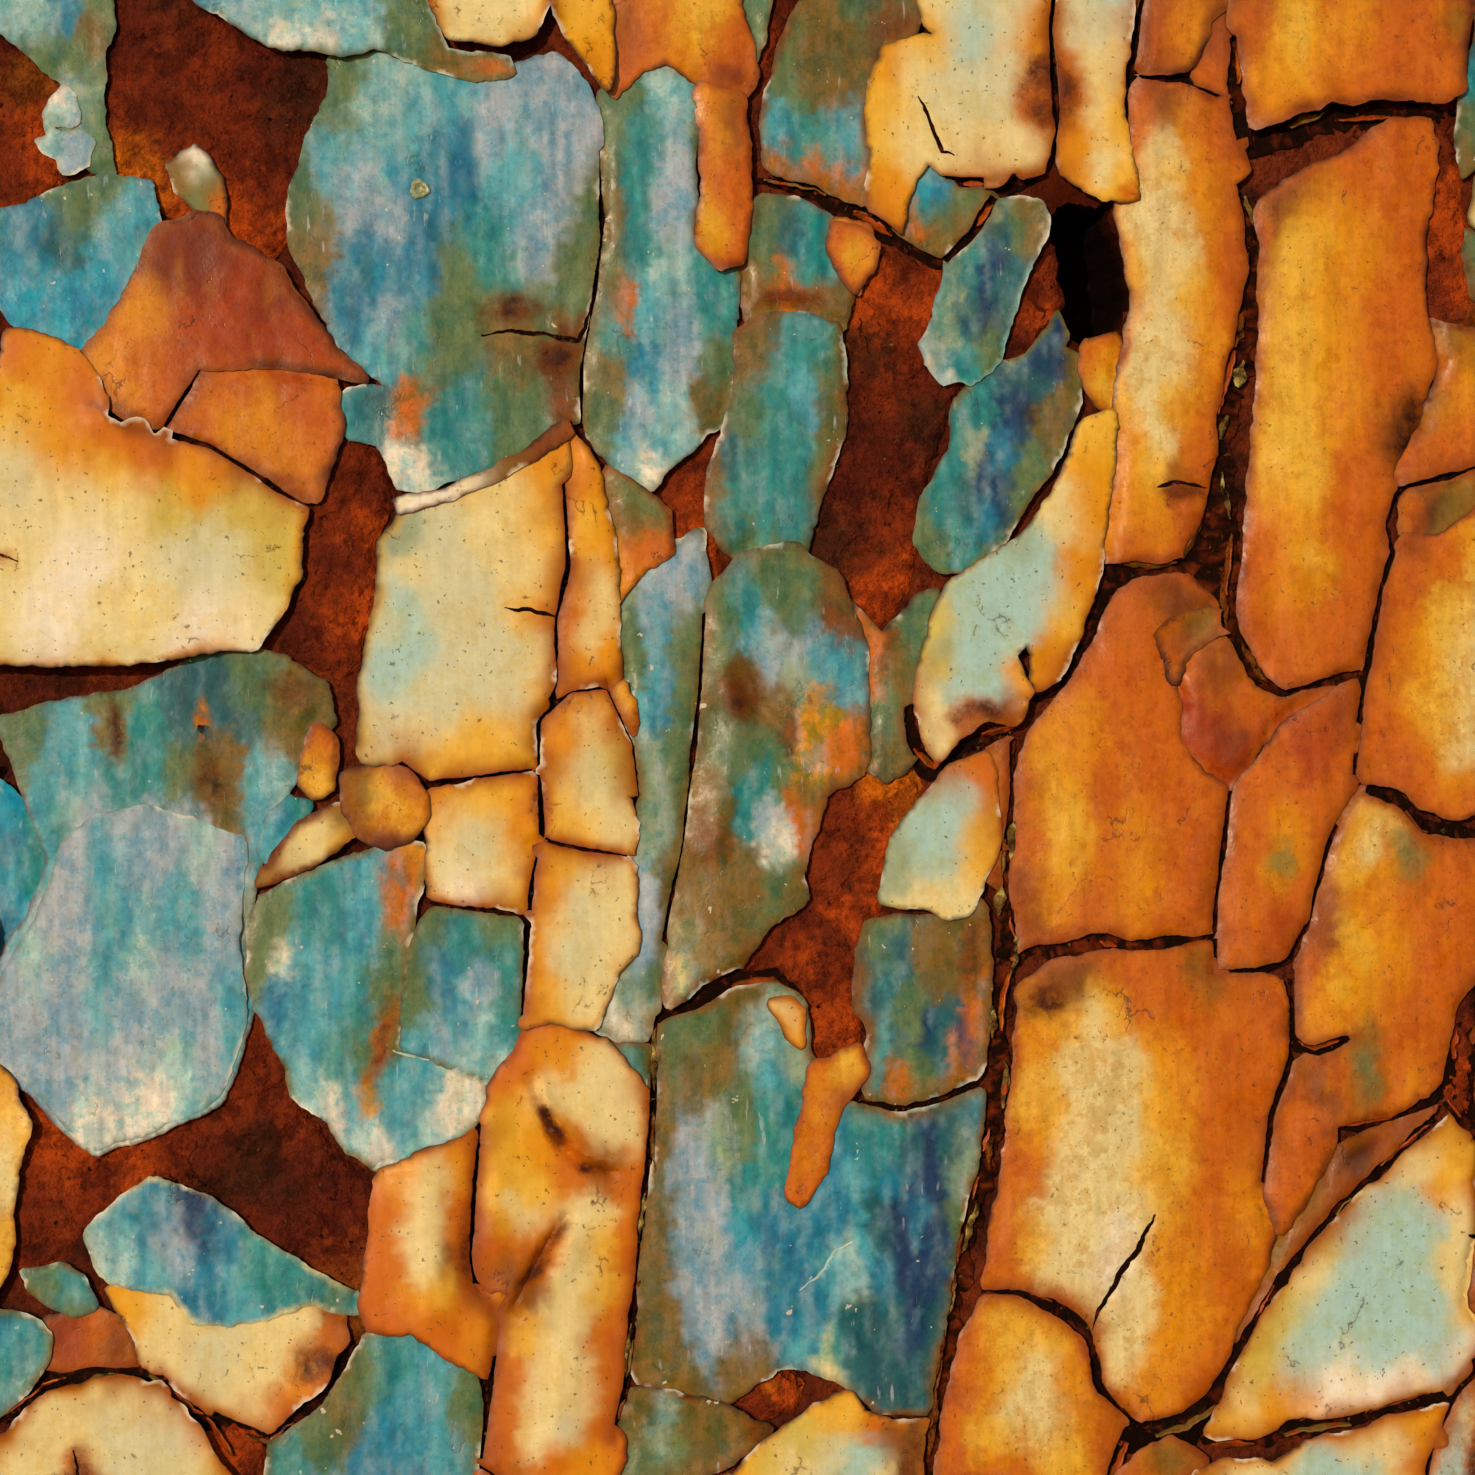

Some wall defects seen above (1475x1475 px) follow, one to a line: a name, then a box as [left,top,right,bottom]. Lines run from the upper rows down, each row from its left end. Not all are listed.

rust [0,34,63,207]
rust [104,0,328,260]
crack [751,0,1060,270]
peeling [0,0,742,1287]
rust [809,246,964,629]
peeling [607,0,1475,1010]
crack [850,0,1475,1475]
peeling [932,116,1475,1475]
crack [71,1450,79,1475]
rust [13,1013,373,1292]
peeling [0,1176,484,1475]
peeling [618,735,1014,1475]